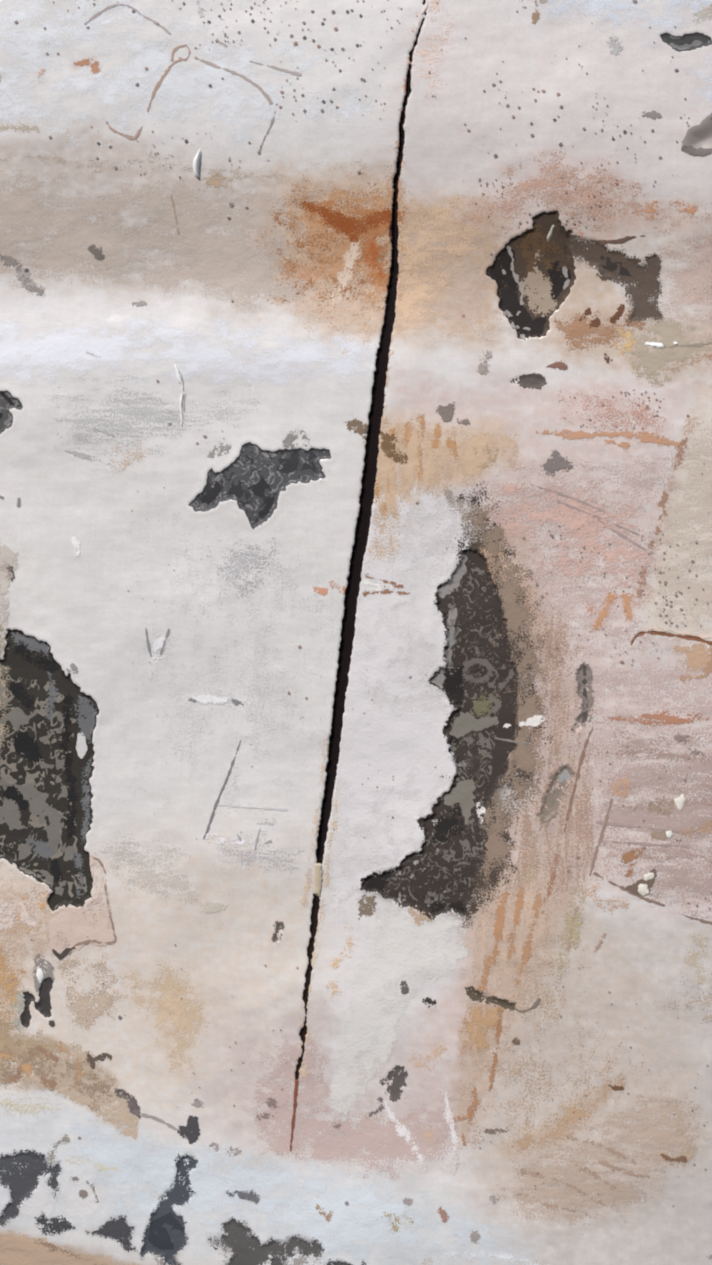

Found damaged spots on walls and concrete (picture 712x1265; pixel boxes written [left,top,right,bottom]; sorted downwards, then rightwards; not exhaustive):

peeling [660,32,712,51]
peeling [486,211,663,340]
peeling [0,390,22,433]
peeling [0,544,117,1032]
peeling [188,430,331,529]
crack [316,0,426,864]
rust [247,0,712,1179]
peeling [314,436,712,935]
crack [290,893,320,1151]
peeling [0,1133,71,1227]